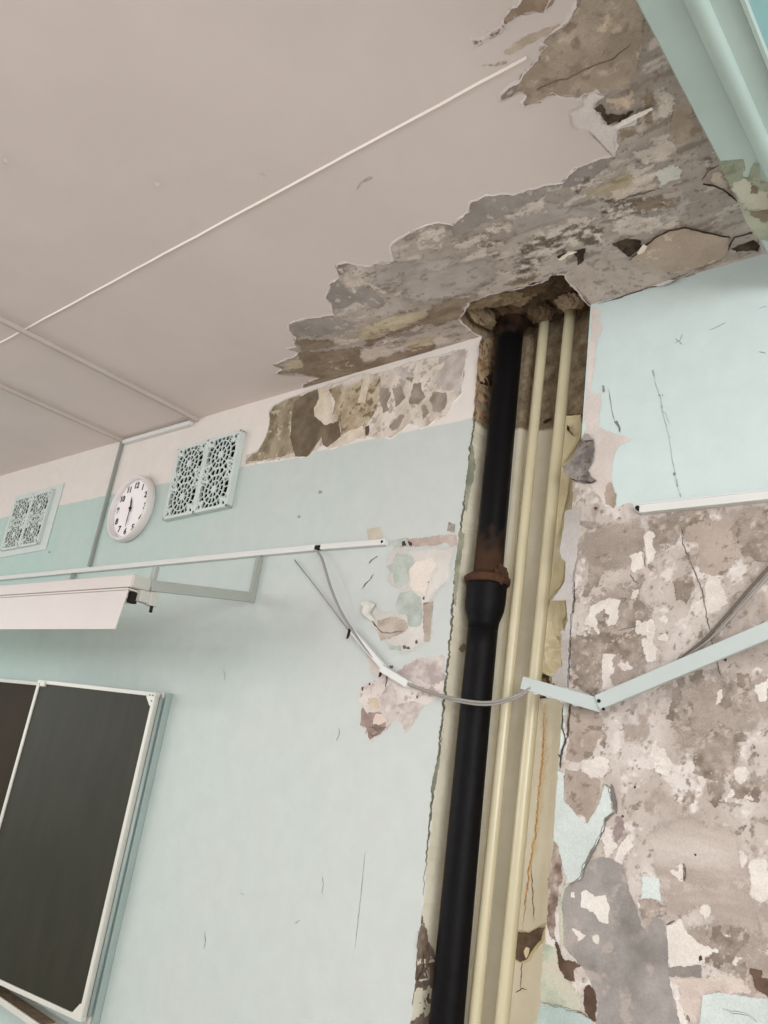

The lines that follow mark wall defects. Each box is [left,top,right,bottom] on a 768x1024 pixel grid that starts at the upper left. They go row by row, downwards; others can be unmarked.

crack [537,46,629,90]
crack [630,227,752,260]
peeling [718,160,768,260]
peeling [245,0,653,597]
crack [652,370,681,498]
corrosion [495,563,509,585]
peeling [357,522,457,742]
flaking render [410,916,435,1024]